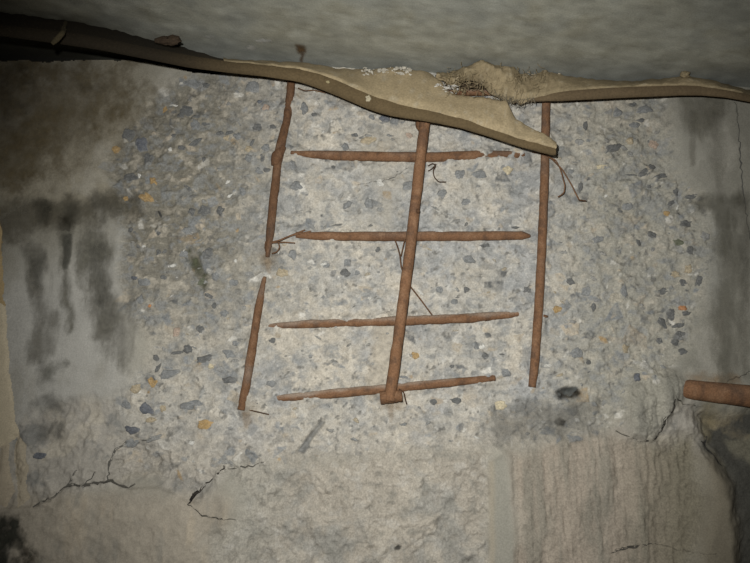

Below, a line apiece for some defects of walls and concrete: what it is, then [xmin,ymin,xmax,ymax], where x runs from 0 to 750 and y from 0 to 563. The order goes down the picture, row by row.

leakage [26,248,41,297]
leakage [60,230,112,271]
leakage [90,278,125,338]
spalling [105,72,713,563]
crack [616,397,700,442]
crack [33,438,152,507]
crack [187,462,264,520]